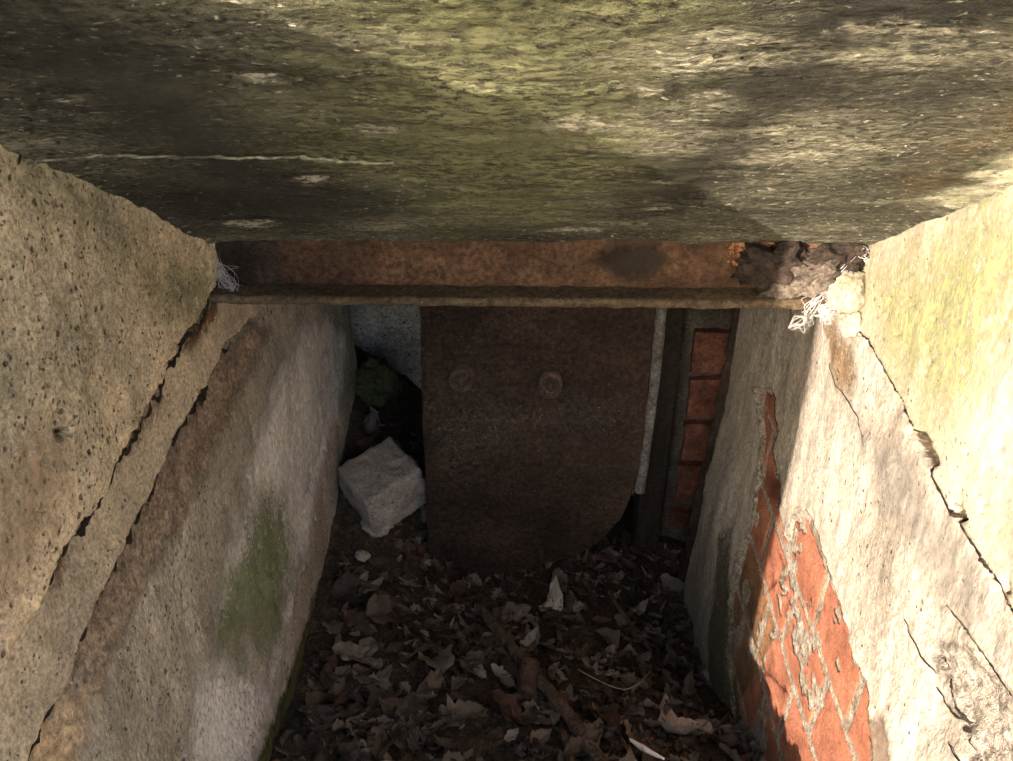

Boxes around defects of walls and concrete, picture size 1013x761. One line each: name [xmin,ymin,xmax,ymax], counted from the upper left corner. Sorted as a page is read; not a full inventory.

damp [794,0,956,48]
damp [0,0,362,228]
damp [928,155,1013,206]
rust [215,240,282,286]
rust [594,245,666,280]
crack [49,297,231,594]
crack [859,332,928,436]
damp [192,313,347,761]
flaking render [726,386,873,761]
crack [930,468,1013,613]
crack [904,619,981,761]
flaking render [933,641,1013,761]